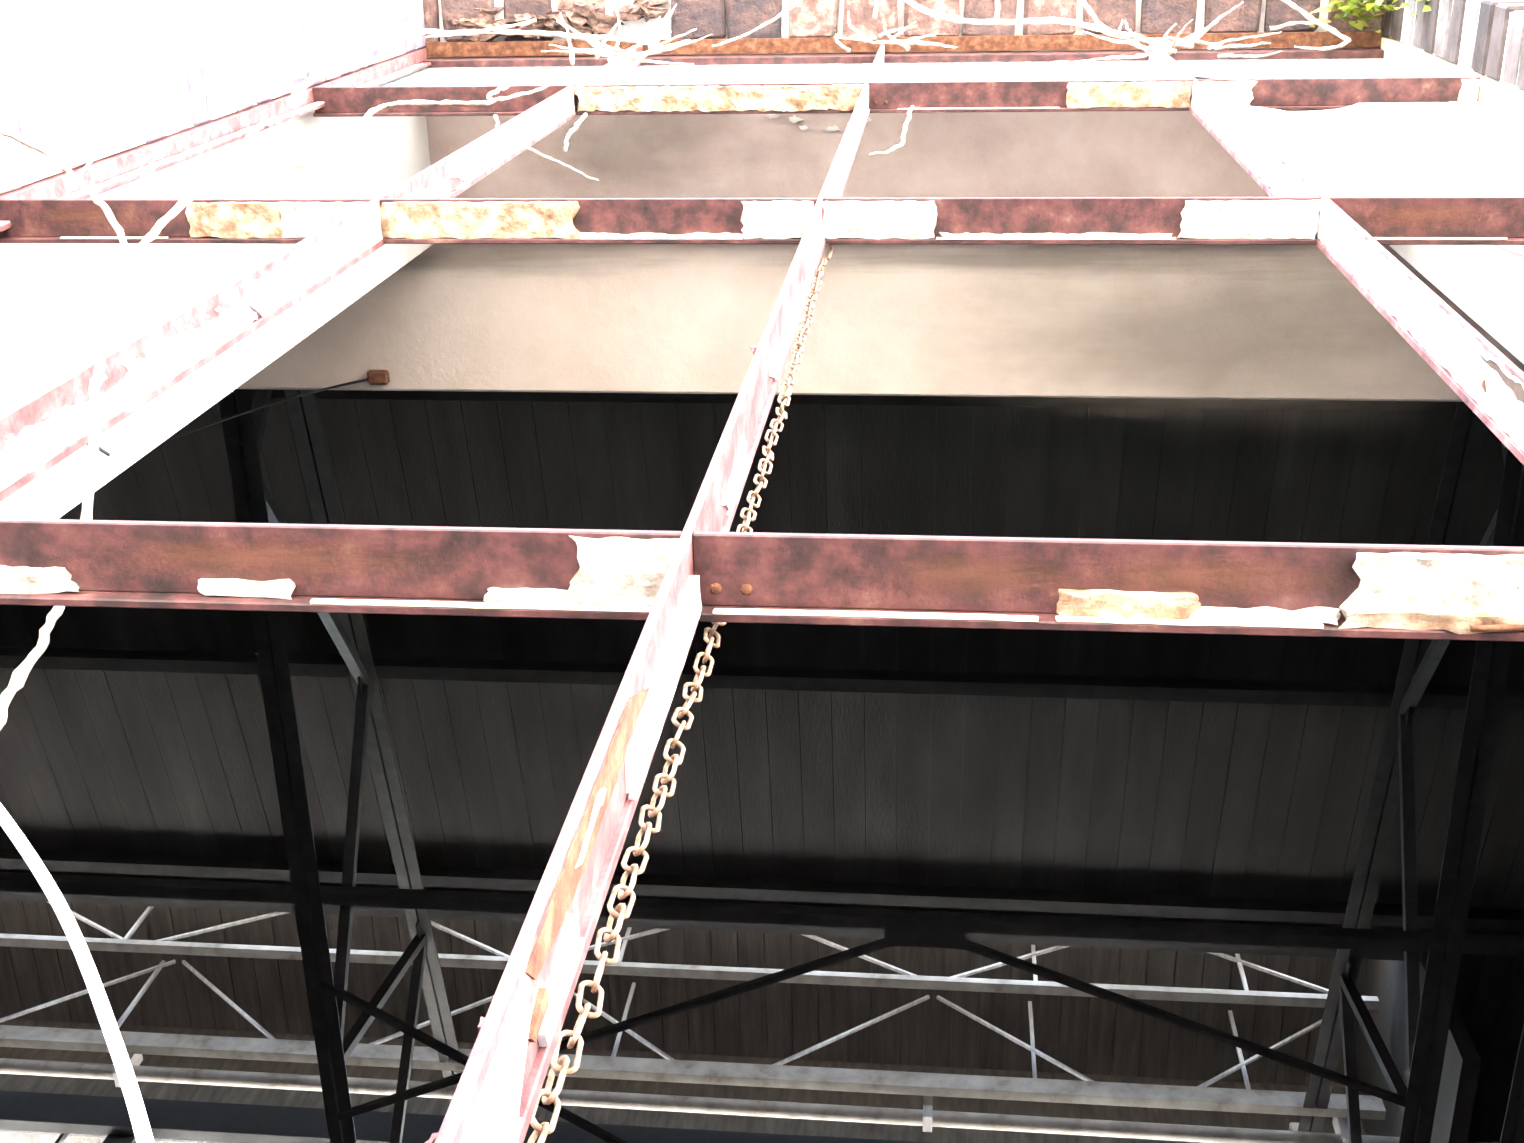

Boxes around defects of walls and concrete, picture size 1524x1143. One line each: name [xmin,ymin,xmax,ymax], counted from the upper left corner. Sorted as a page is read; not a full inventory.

corrosion [52,211,107,222]
peeling [0,45,1524,491]
peeling [722,454,749,516]
peeling [0,565,79,594]
peeling [197,578,295,600]
peeling [310,536,679,612]
peeling [625,552,1524,800]
corrosion [525,688,650,1043]
peeling [575,788,606,868]
peeling [459,914,585,1143]